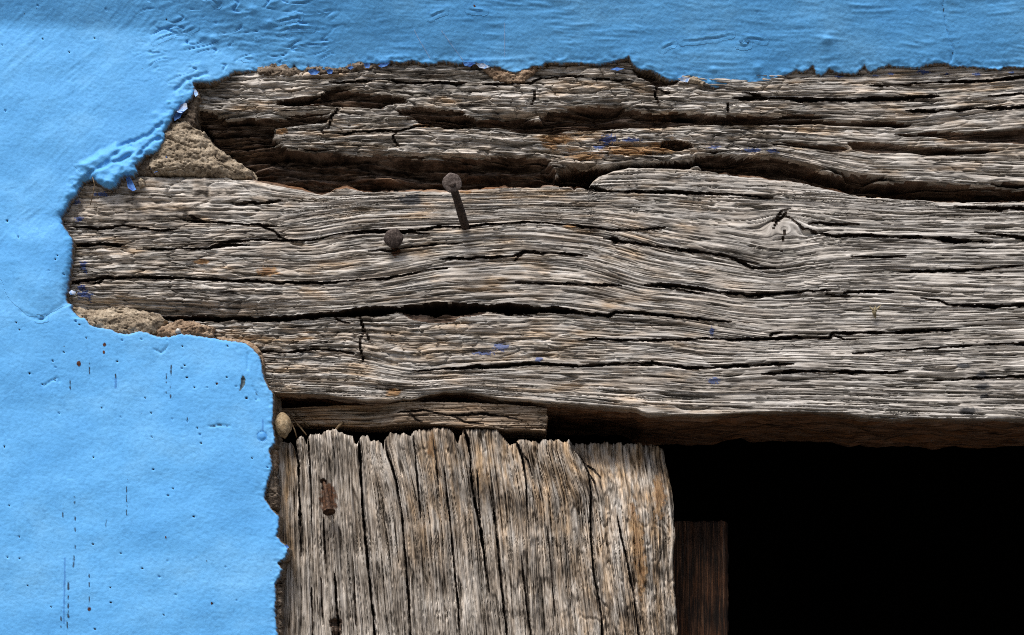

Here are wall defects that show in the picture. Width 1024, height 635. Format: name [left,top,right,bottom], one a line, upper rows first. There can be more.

flaking render [257,62,389,77]
flaking render [463,62,541,85]
flaking render [678,75,706,87]
peeling [126,88,258,191]
crack [71,199,1024,375]
peeling [69,290,266,372]
corrosion [319,484,337,510]